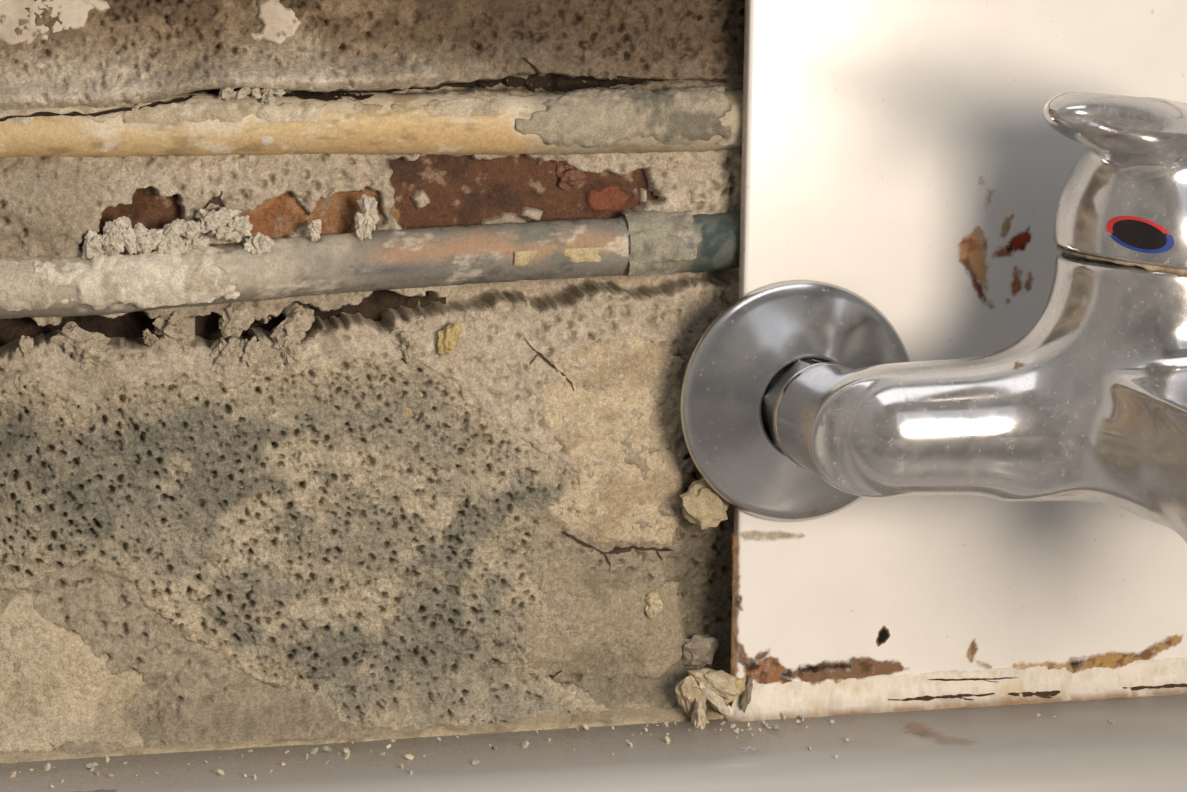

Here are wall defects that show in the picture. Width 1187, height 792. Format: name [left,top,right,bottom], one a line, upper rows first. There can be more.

peeling [0,0,110,45]
peeling [250,0,301,44]
crack [0,57,703,122]
flaking render [81,186,181,248]
flaking render [241,154,658,239]
corrosion [960,215,1032,302]
spalling [0,353,650,730]
corrosion [967,641,977,662]
corrosion [1013,635,1182,673]